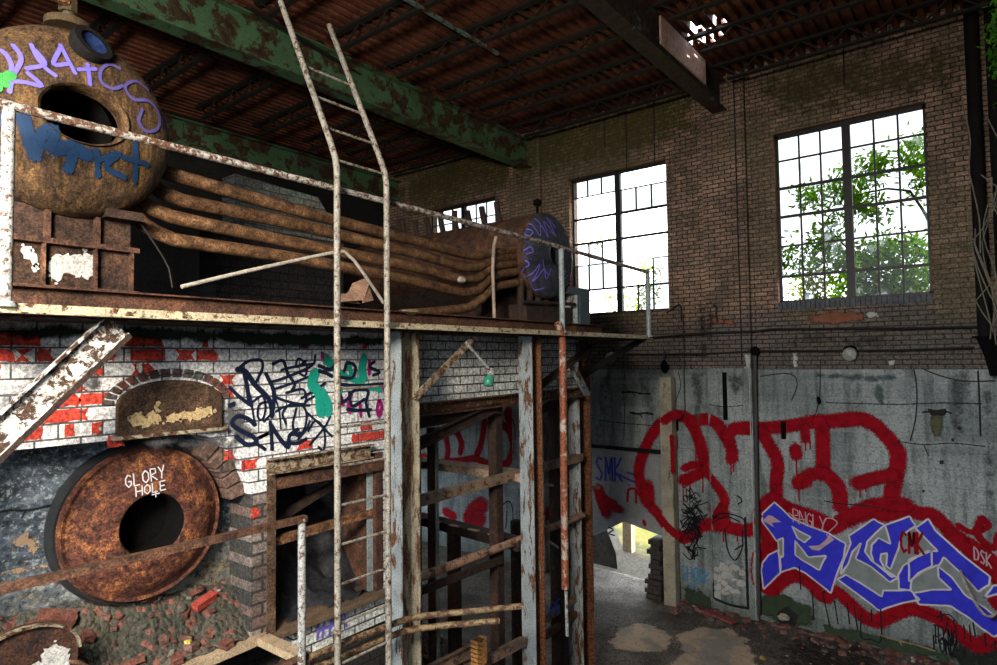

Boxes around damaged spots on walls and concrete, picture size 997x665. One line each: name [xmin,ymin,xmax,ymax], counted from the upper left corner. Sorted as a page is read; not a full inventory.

peeling [20,243,99,285]
peeling [0,313,645,341]
peeling [0,333,55,378]
peeling [124,337,218,375]
peeling [218,374,236,397]
peeling [25,386,125,448]
peeling [127,401,217,428]
peeling [351,421,384,443]
peeling [32,640,71,665]